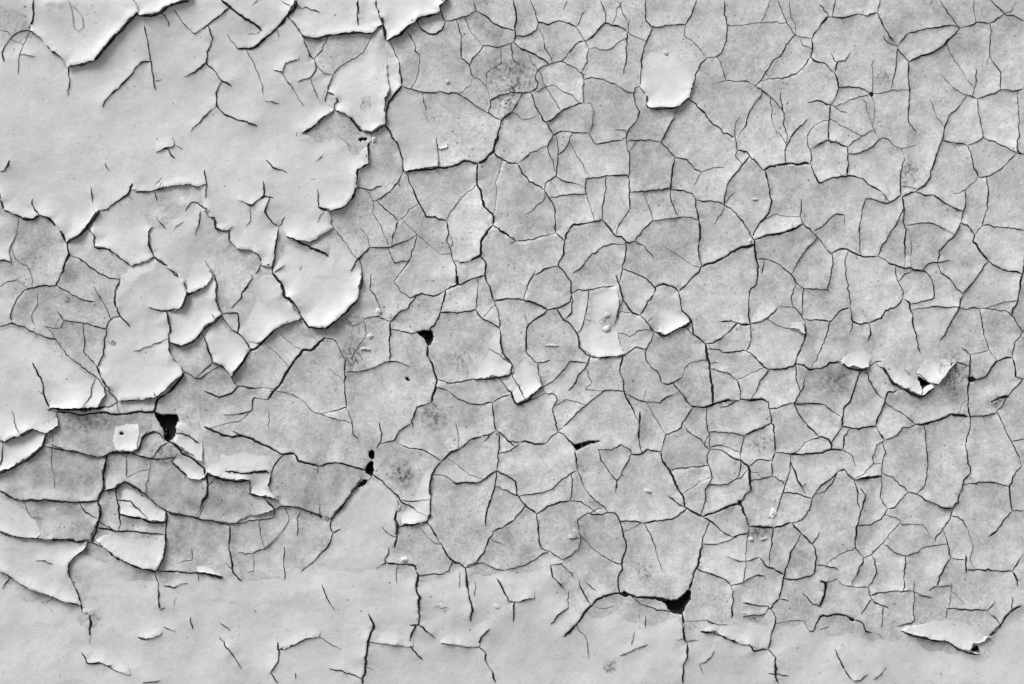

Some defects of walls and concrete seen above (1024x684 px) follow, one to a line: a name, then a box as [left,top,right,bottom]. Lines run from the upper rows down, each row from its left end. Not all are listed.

crack [1,0,36,72]
crack [67,0,262,131]
peeling [639,52,694,108]
peeling [0,0,445,401]
crack [0,183,365,484]
crack [226,0,1024,684]
crack [0,427,323,642]
peeling [0,328,1024,684]
crack [81,652,122,673]